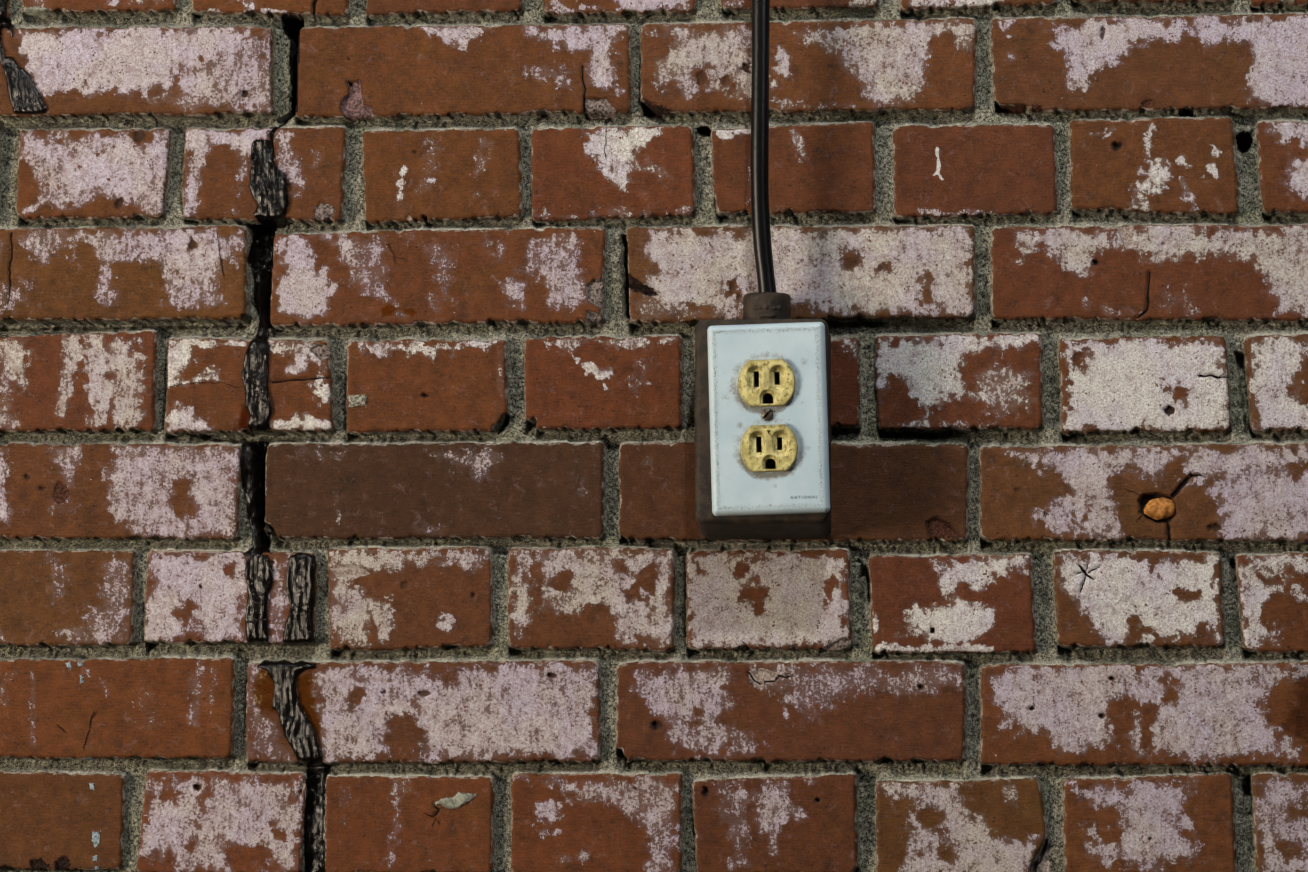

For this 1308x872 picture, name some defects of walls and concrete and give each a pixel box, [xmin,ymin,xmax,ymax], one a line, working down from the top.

damp [0,0,272,115]
crack [270,0,317,156]
spalling [340,78,374,123]
damp [522,0,752,101]
damp [769,0,1004,109]
damp [1046,14,1308,201]
crack [6,232,14,304]
damp [1015,123,1308,318]
crack [272,376,331,384]
damp [18,127,1041,872]
damp [990,336,1308,765]
crack [1126,474,1205,540]